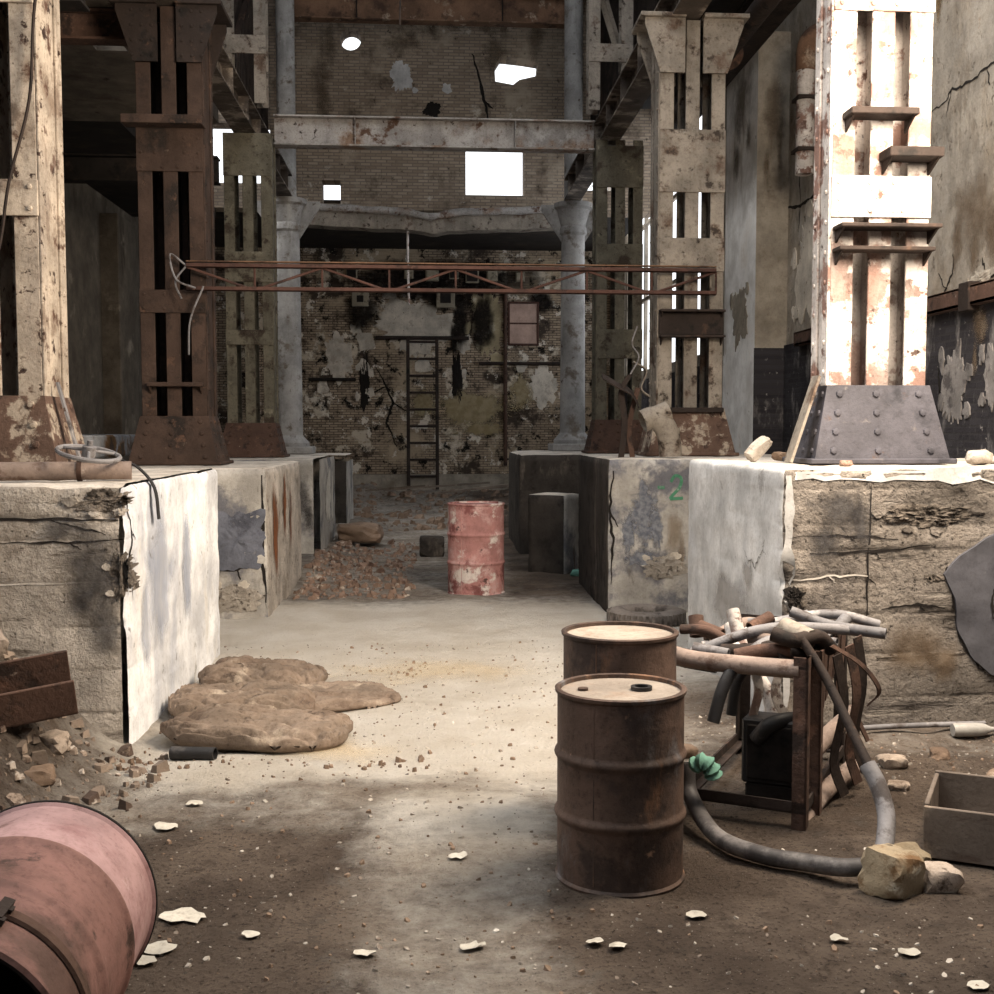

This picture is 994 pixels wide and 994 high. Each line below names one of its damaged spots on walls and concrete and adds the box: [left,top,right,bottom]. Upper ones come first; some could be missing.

crack [931,61,994,113]
peeling [317,294,503,411]
peeling [516,360,559,410]
peeling [937,338,994,424]
crack [0,501,136,557]
leakage [622,479,684,566]
crack [0,582,133,595]
leakage [74,539,118,649]